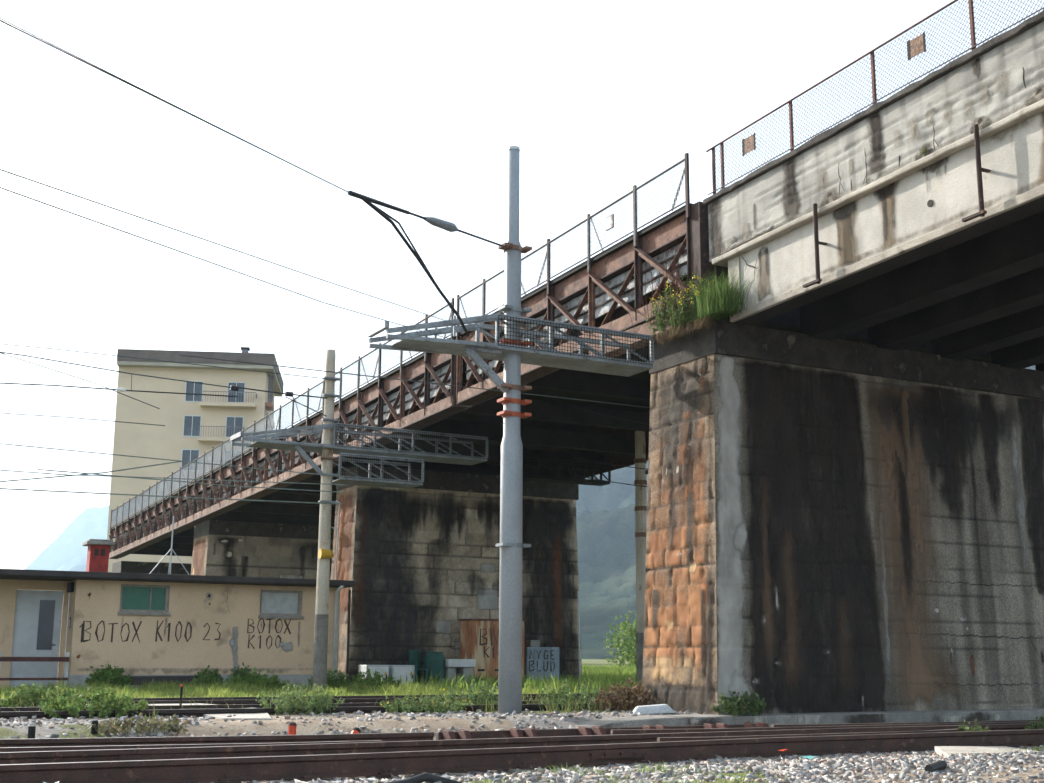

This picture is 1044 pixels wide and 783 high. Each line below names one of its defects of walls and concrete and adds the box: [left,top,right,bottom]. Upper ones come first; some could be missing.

water stain [782,158,800,221]
water stain [833,201,856,266]
water stain [868,112,895,247]
water stain [993,123,1024,140]
water stain [348,488,500,684]
water stain [522,499,579,680]
rust [644,463,708,683]
water stain [744,361,1044,723]